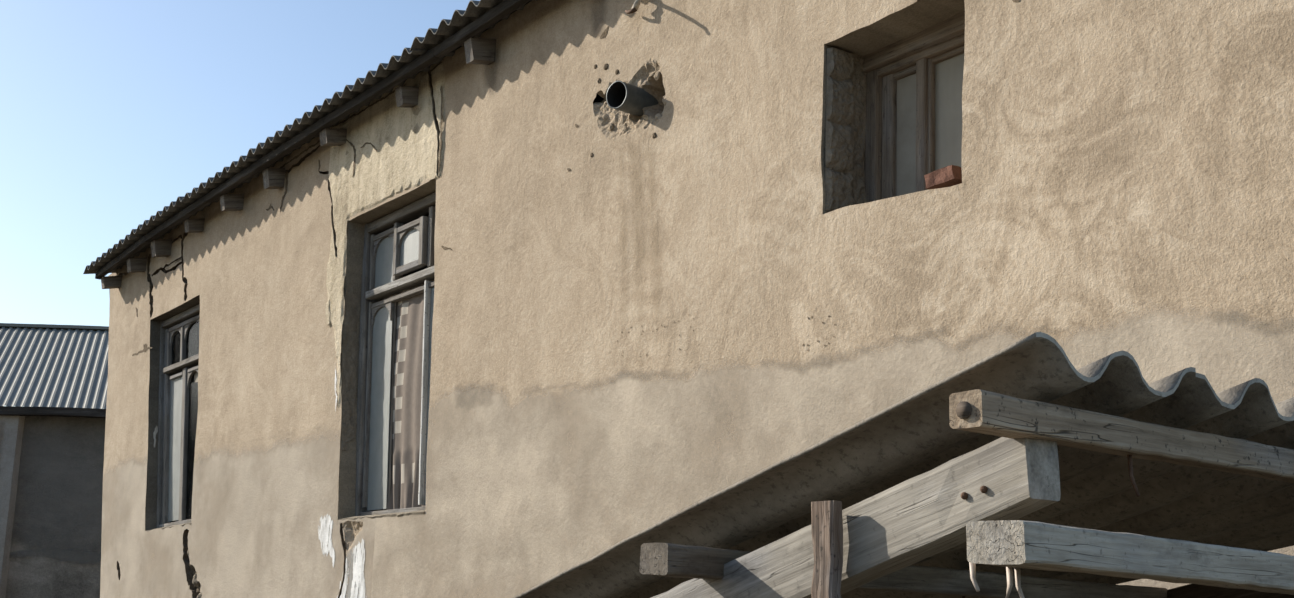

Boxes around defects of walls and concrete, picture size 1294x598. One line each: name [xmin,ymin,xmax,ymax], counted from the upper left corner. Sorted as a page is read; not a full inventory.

flaking render [593,58,667,141]
crack [266,62,443,256]
crack [116,232,188,356]
crack [183,530,202,598]
peeling [318,515,363,567]